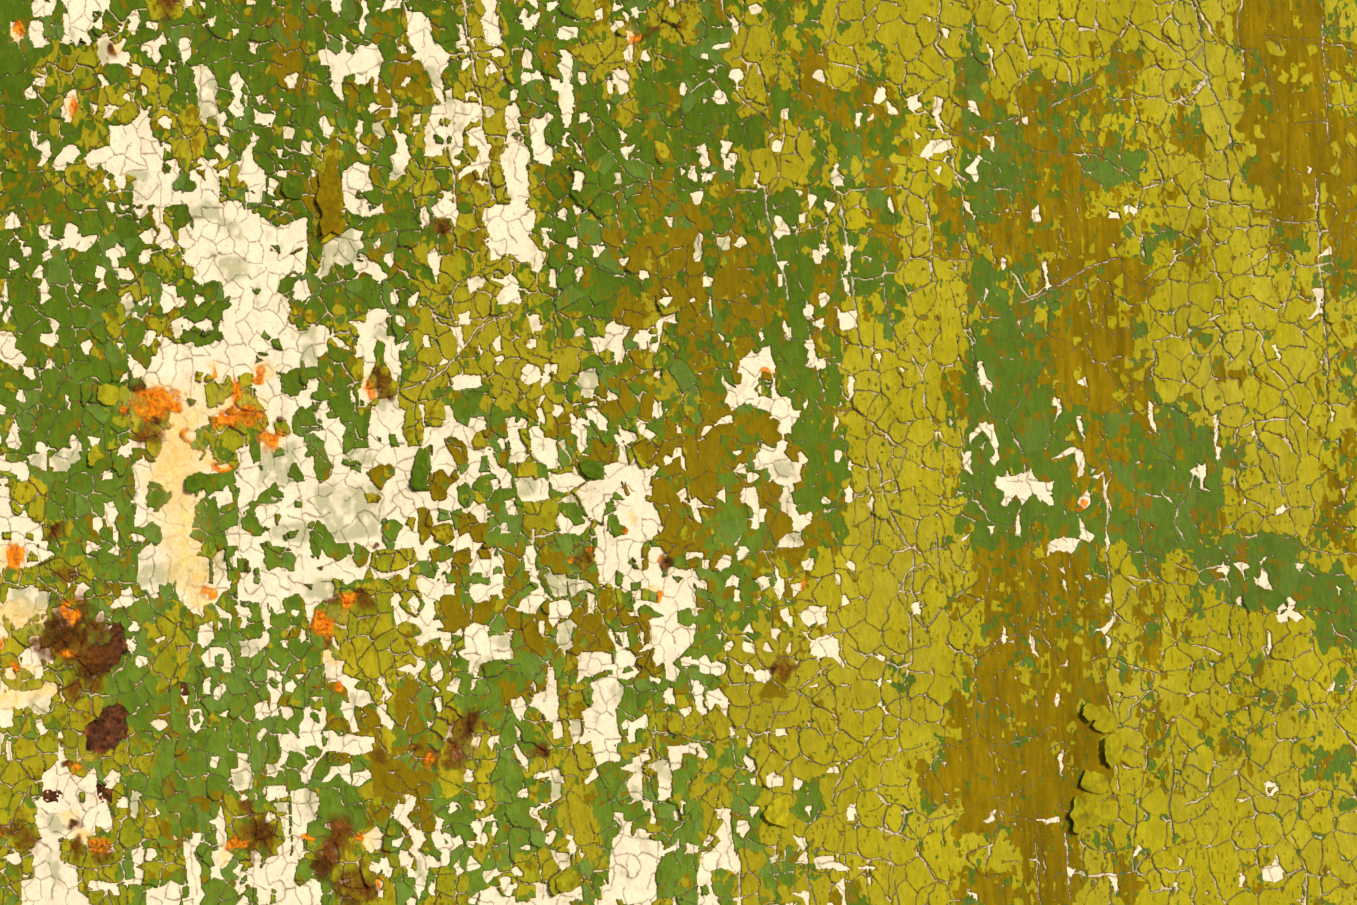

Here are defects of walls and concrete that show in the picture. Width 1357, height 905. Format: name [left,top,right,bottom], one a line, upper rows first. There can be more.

crack [1173,0,1246,183]
crack [764,186,789,301]
crack [1273,178,1330,371]
corrosion [0,598,112,700]
corrosion [120,364,283,606]
peeling [0,0,875,905]
spalling [911,600,922,617]
crack [1099,449,1193,614]
peeling [958,136,1357,905]
corrosion [410,713,485,766]
corrosion [301,818,381,905]
crack [1035,833,1071,904]